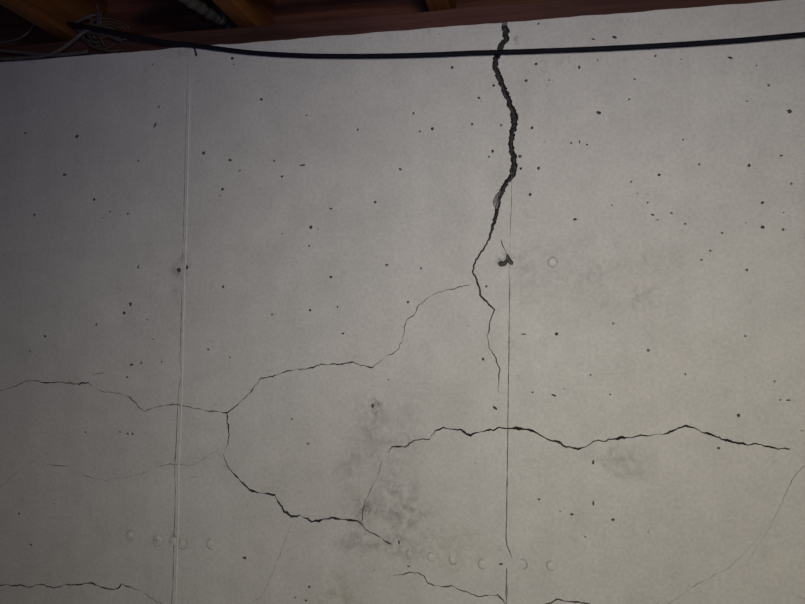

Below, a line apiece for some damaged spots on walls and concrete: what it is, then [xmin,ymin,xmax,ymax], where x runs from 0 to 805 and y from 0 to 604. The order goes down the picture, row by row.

crack [0,22,518,604]
crack [389,425,790,451]
crack [546,596,590,604]